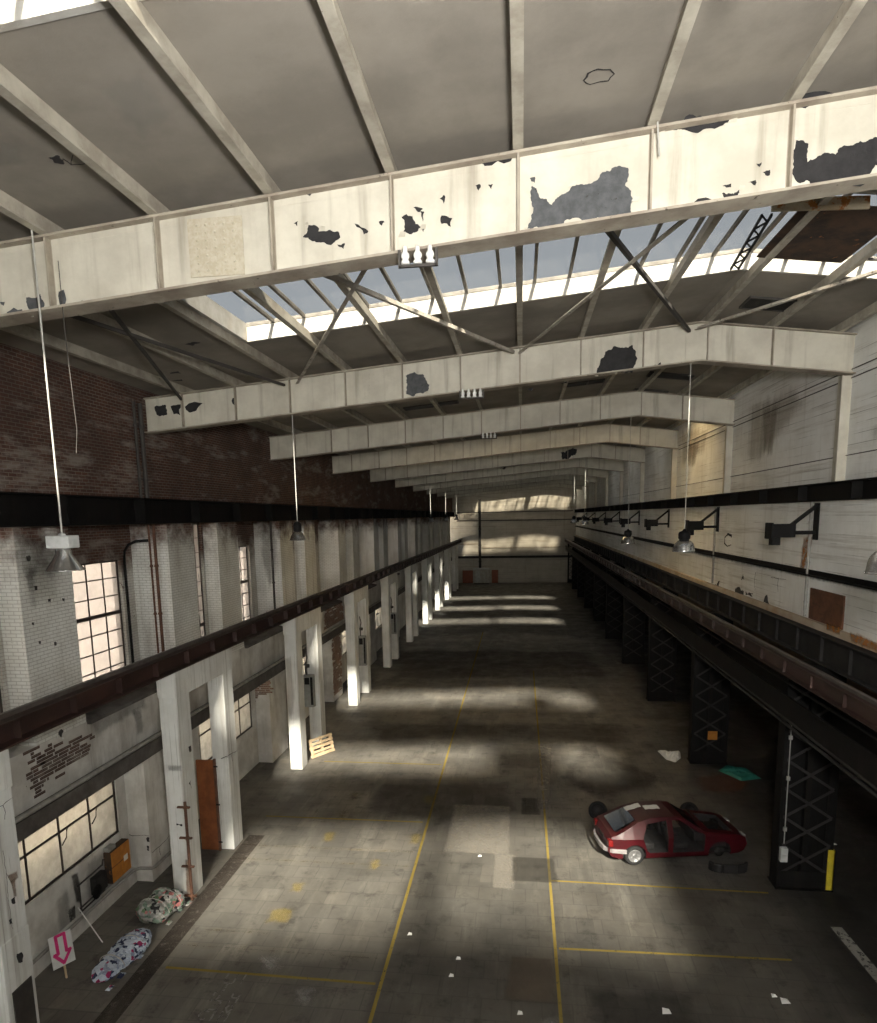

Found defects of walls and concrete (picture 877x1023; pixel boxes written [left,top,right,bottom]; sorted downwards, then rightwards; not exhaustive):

peeling [792,137,877,186]
peeling [524,166,640,230]
peeling [294,221,345,249]
peeling [398,207,426,237]
peeling [596,345,637,376]
peeling [406,372,432,397]
peeling [153,402,202,416]